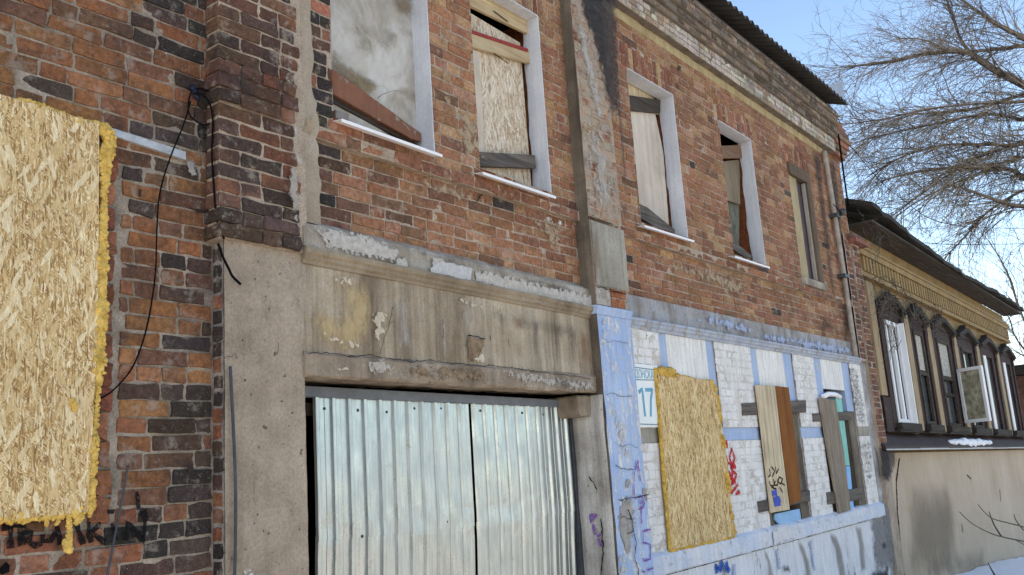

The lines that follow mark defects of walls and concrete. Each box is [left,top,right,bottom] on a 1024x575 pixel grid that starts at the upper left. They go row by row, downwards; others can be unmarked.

leakage [578,24,602,117]
leakage [588,130,612,208]
peeling [319,275,388,348]
peeling [317,228,408,267]
peeling [431,257,592,306]
peeling [369,359,395,375]
spalling [410,335,485,384]
crack [309,308,632,397]
peeling [504,370,595,391]
crack [600,494,649,575]